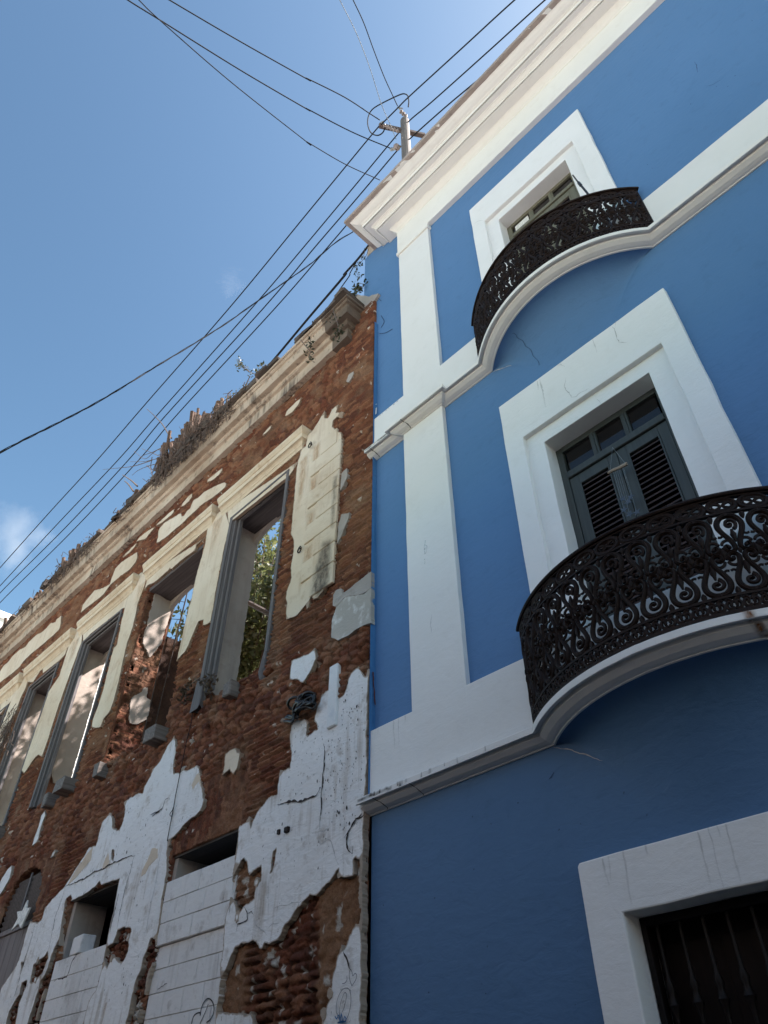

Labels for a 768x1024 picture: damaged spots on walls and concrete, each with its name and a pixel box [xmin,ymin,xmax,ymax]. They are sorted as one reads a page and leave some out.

flaking render [81,468,227,613]
flaking render [0,616,63,683]
flaking render [142,593,171,658]
flaking render [290,648,318,684]
flaking render [331,588,375,641]
flaking render [128,687,151,725]
flaking render [222,748,244,777]
flaking render [0,865,15,897]
flaking render [106,928,131,963]
flaking render [222,859,361,1024]
flaking render [10,946,63,1024]
flaking render [123,939,160,1024]